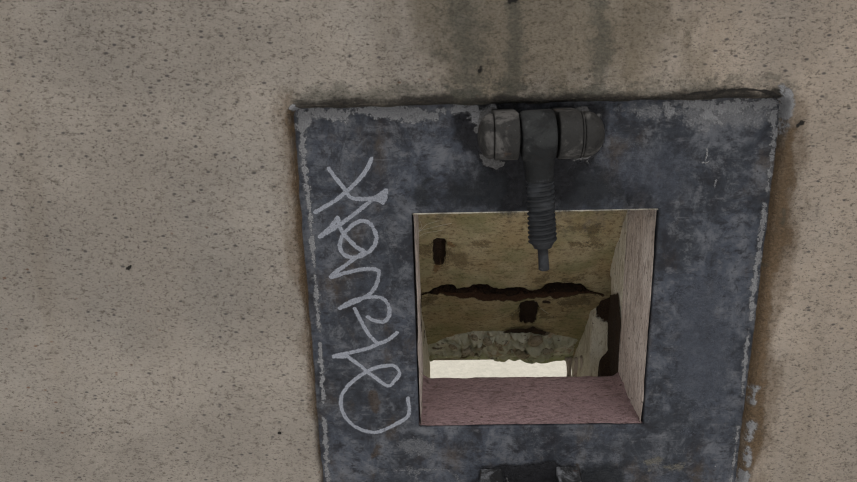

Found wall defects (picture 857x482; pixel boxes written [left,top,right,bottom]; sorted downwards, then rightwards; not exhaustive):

damp [289,0,796,405]
spalling [428,300,578,364]
crack [422,282,621,377]
damp [321,417,331,482]
damp [730,420,758,482]